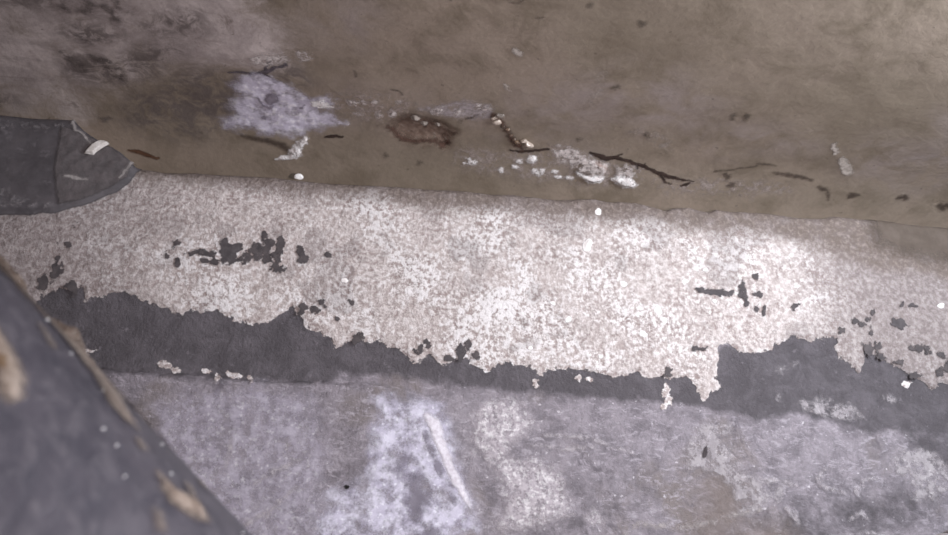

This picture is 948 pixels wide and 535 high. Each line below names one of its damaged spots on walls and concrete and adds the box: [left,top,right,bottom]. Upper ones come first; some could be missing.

leakage [224,52,407,160]
leakage [427,103,491,118]
leakage [462,146,640,188]
peeling [0,113,948,410]
leakage [162,386,474,535]